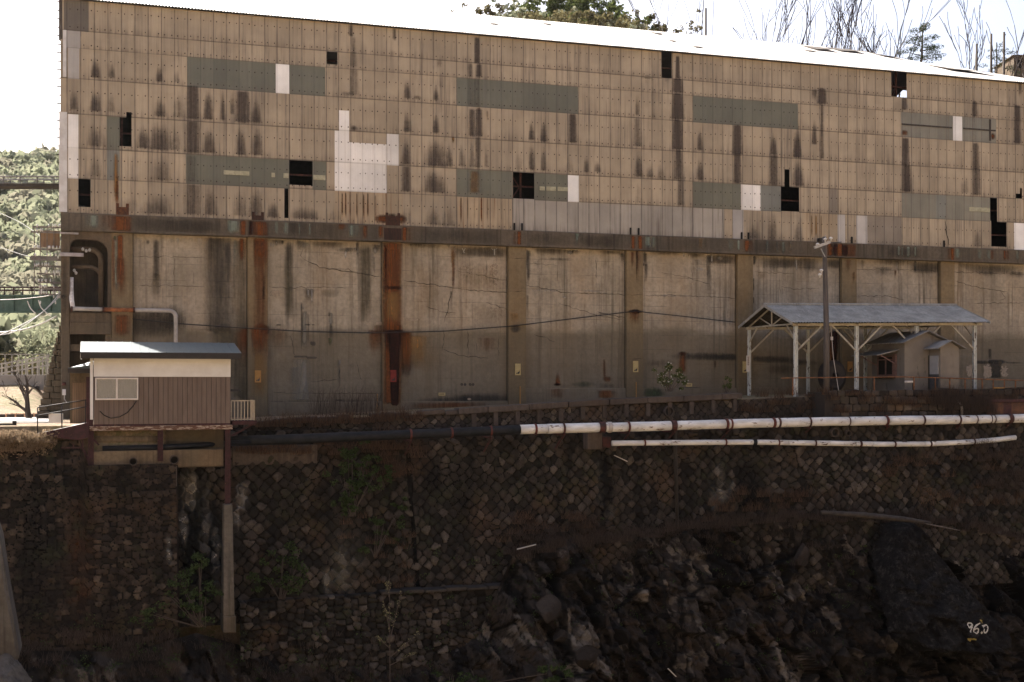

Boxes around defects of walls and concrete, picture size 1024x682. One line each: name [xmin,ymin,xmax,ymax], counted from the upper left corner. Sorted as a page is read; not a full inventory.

water stain [178,86,260,155]
water stain [470,109,482,168]
water stain [672,56,683,205]
water stain [733,125,741,183]
water stain [794,135,802,186]
water stain [813,88,826,158]
water stain [902,138,910,192]
corrosion [108,216,130,288]
corrosion [240,221,269,349]
water stain [253,196,317,345]
corrosion [340,193,422,406]
crack [256,250,734,358]